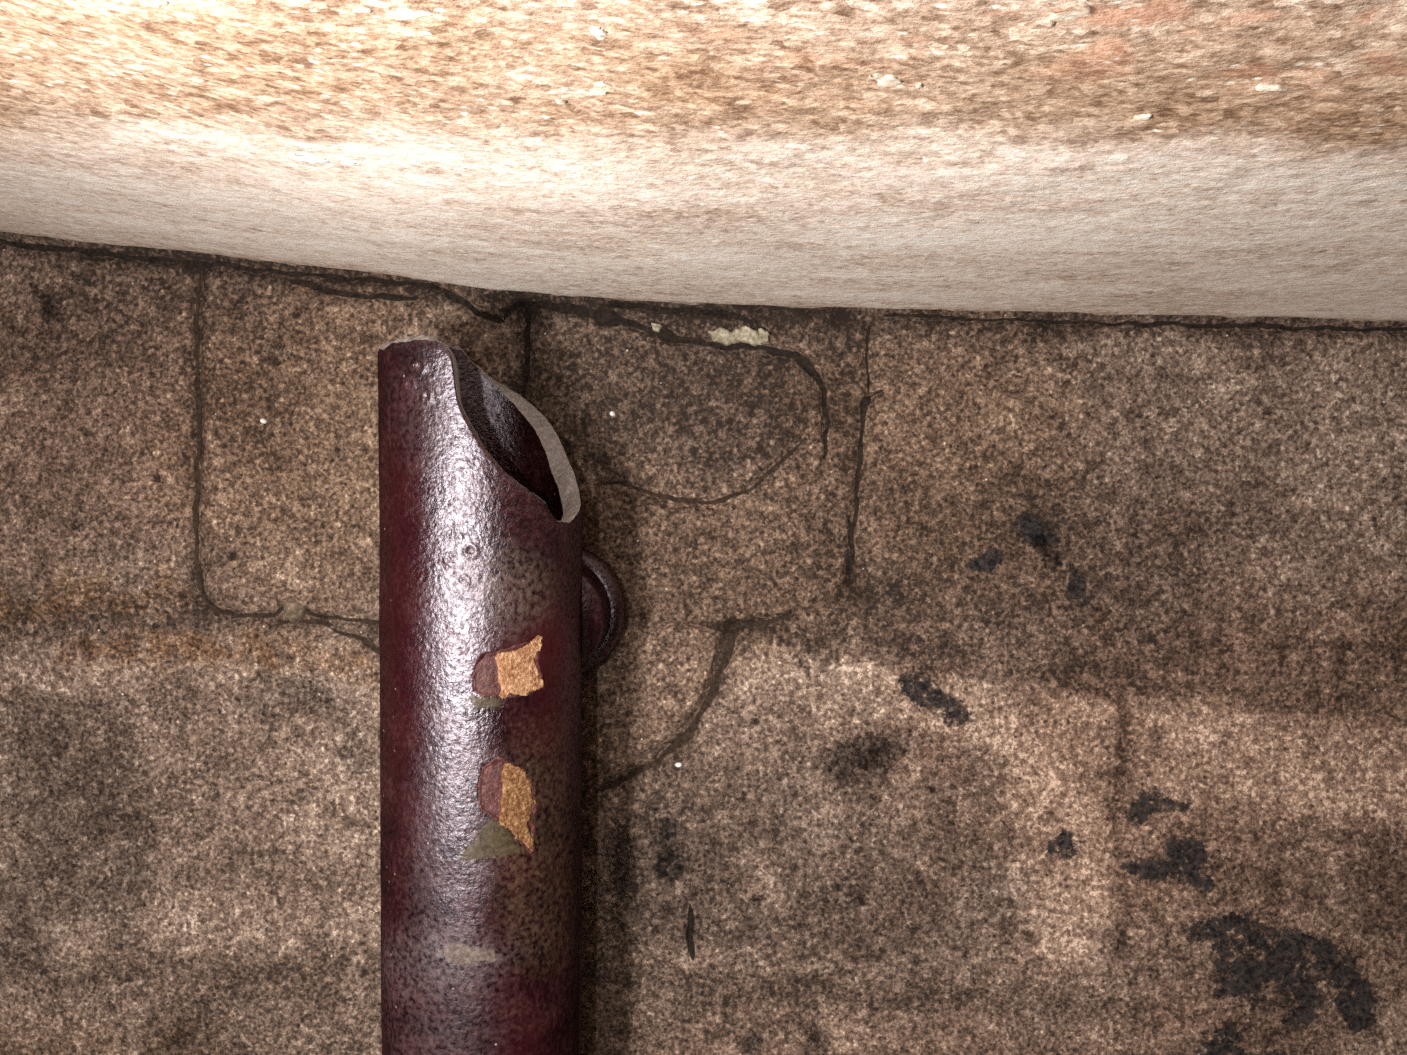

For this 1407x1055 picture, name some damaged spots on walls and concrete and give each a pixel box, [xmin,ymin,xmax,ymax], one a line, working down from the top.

crack [0,239,1407,654]
water stain [1013,513,1060,548]
water stain [965,548,1003,573]
water stain [1067,568,1091,607]
crack [598,614,795,791]
water stain [898,672,972,727]
water stain [1127,786,1192,826]
water stain [1046,830,1085,859]
water stain [1121,835,1215,893]
water stain [1194,1024,1285,1055]